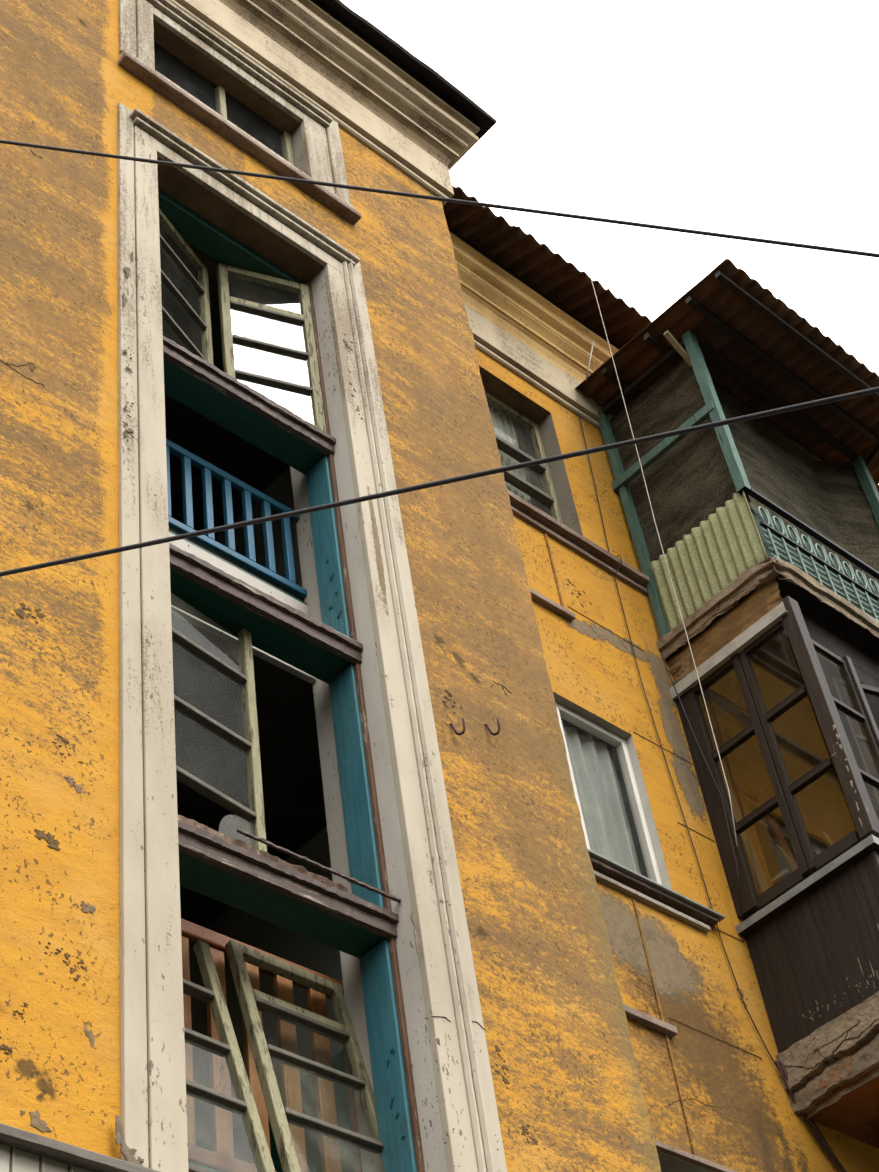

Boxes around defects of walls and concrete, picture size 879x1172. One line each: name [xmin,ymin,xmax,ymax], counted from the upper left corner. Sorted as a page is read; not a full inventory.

crack [0,359,45,387]
peeling [64,776,83,793]
peeling [34,828,61,851]
spalling [80,900,96,914]
peeling [39,941,85,981]
peeling [802,958,879,1021]
spalling [84,1023,95,1047]
crack [784,1019,879,1069]
peeling [495,1034,509,1099]
peeling [20,1109,52,1133]